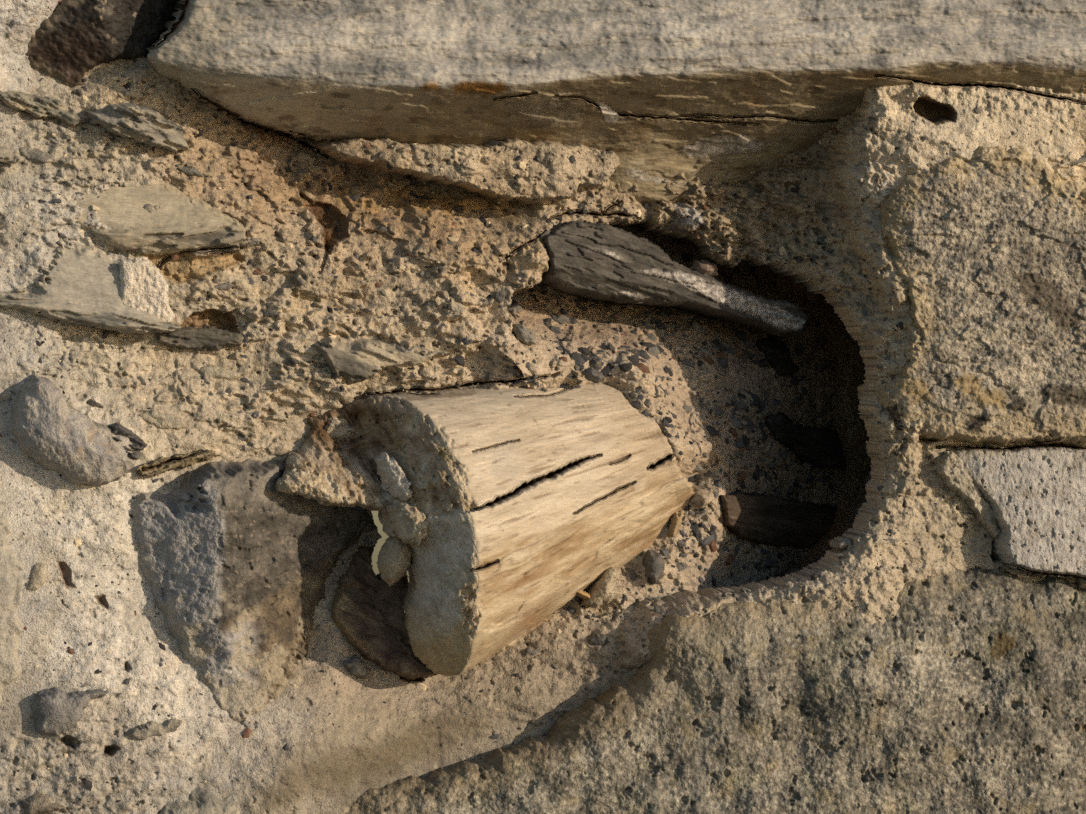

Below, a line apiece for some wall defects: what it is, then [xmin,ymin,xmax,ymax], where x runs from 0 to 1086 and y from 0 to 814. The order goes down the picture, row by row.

crack [493,92,837,126]
crack [353,372,573,400]
spalling [642,550,665,585]